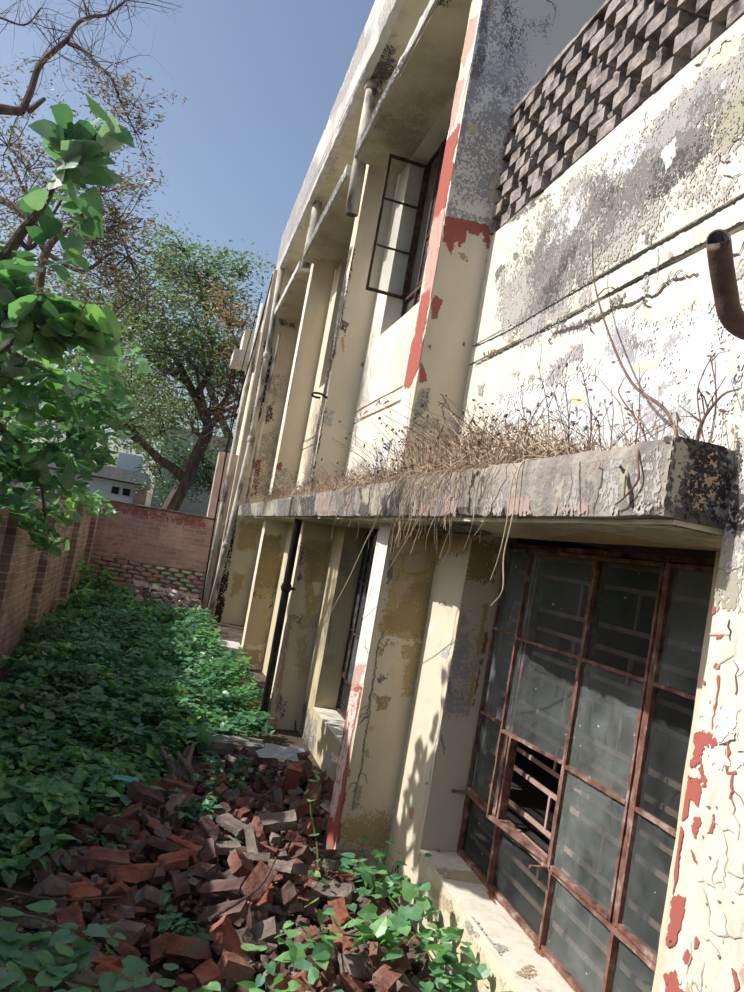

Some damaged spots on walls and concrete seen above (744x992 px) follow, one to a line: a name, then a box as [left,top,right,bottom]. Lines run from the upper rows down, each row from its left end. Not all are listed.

water stain [276,0,430,268]
peeling [371,0,606,475]
water stain [445,0,553,225]
crack [475,135,744,365]
water stain [493,32,744,612]
peeling [661,137,677,174]
water stain [300,700,333,773]
water stain [293,538,351,682]
crack [347,544,436,810]
peeling [323,526,465,849]
peeling [665,699,744,947]
peeling [663,970,688,992]